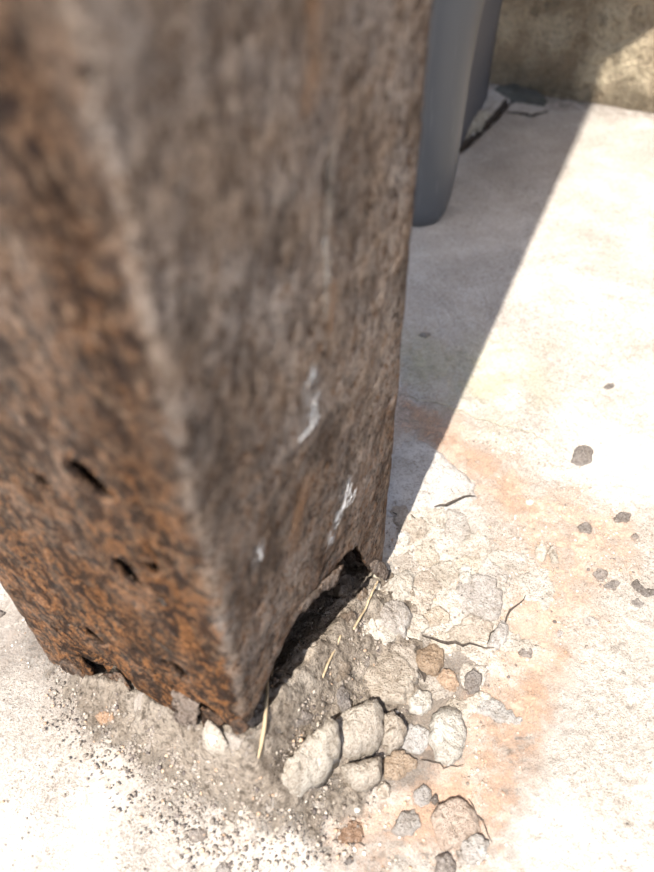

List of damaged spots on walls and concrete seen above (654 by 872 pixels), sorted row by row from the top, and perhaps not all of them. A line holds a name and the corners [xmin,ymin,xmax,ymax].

corrosion [297,564,344,612]
corrosion [58,658,85,679]
corrosion [100,671,132,691]
corrosion [342,401,634,870]
spalling [518,648,533,659]
corrosion [171,690,250,735]